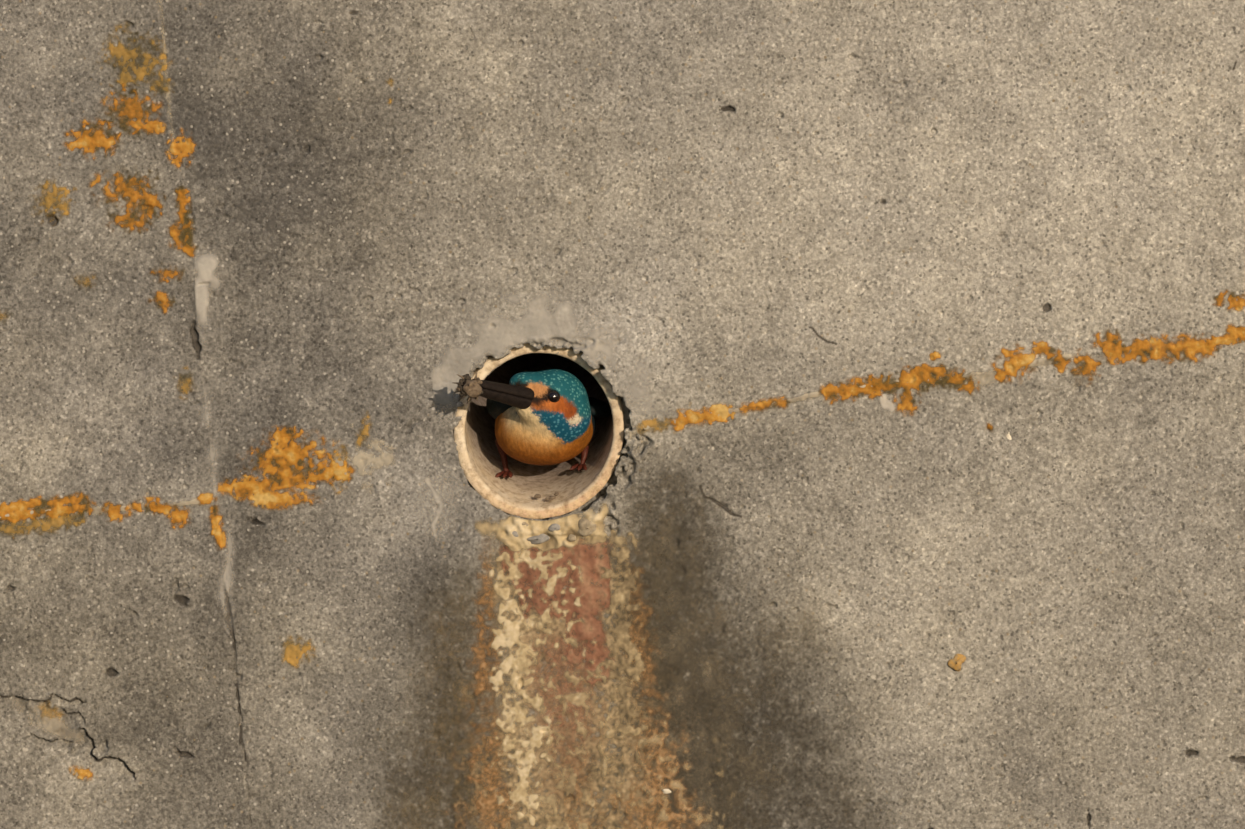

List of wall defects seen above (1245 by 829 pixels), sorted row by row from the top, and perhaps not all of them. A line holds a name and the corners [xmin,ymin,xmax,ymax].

crack [224,597,236,649]
spalling [0,693,136,779]
crack [235,683,246,759]
rust [468,538,705,829]